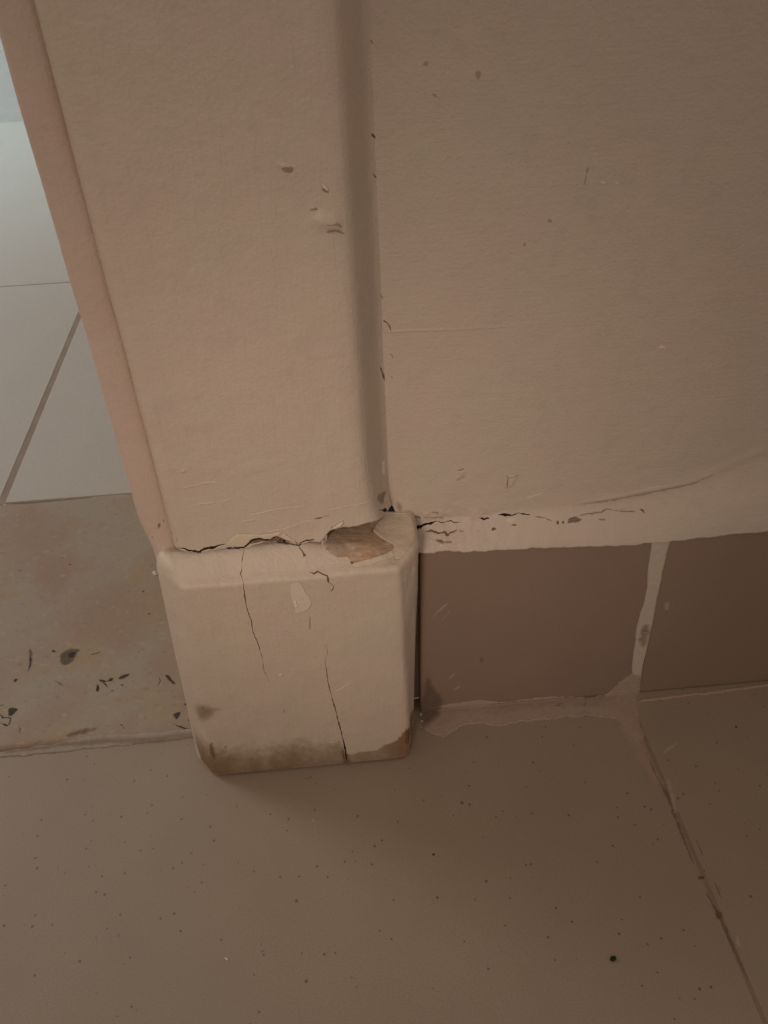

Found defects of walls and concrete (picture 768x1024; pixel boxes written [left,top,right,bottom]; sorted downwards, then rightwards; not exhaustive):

peeling [321,513,415,568]
crack [415,511,552,543]
crack [583,508,644,520]
crack [170,515,334,674]
crack [325,651,348,760]